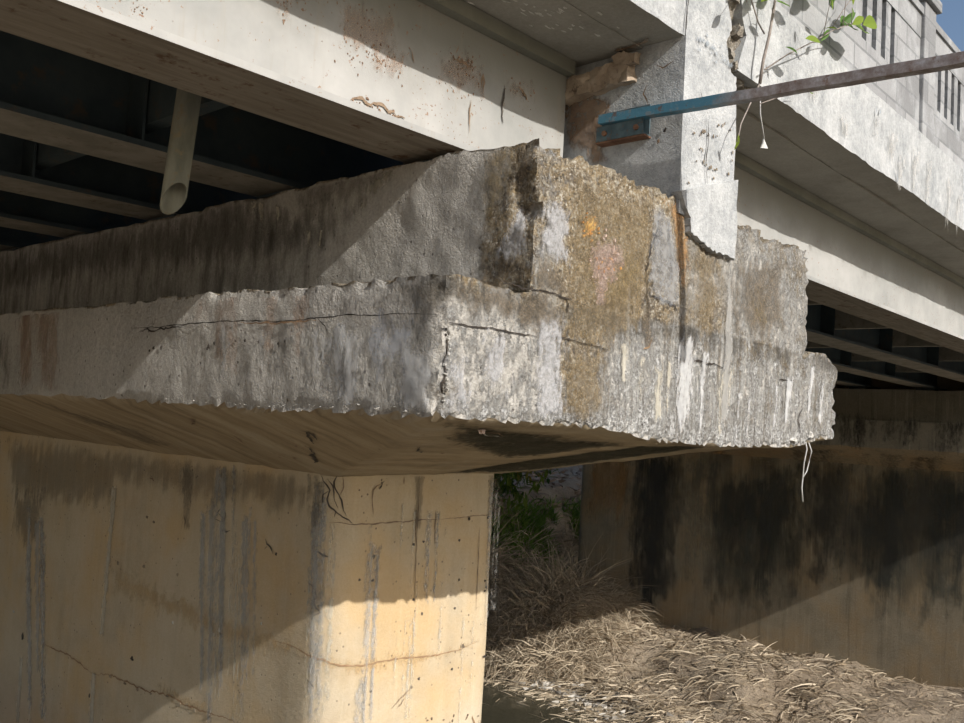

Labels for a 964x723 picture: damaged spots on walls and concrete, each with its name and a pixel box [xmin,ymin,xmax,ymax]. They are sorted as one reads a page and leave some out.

rust [337,0,424,87]
rust [438,46,485,132]
spalling [565,51,641,108]
crack [493,276,589,312]
crack [140,313,608,407]
crack [44,644,237,723]